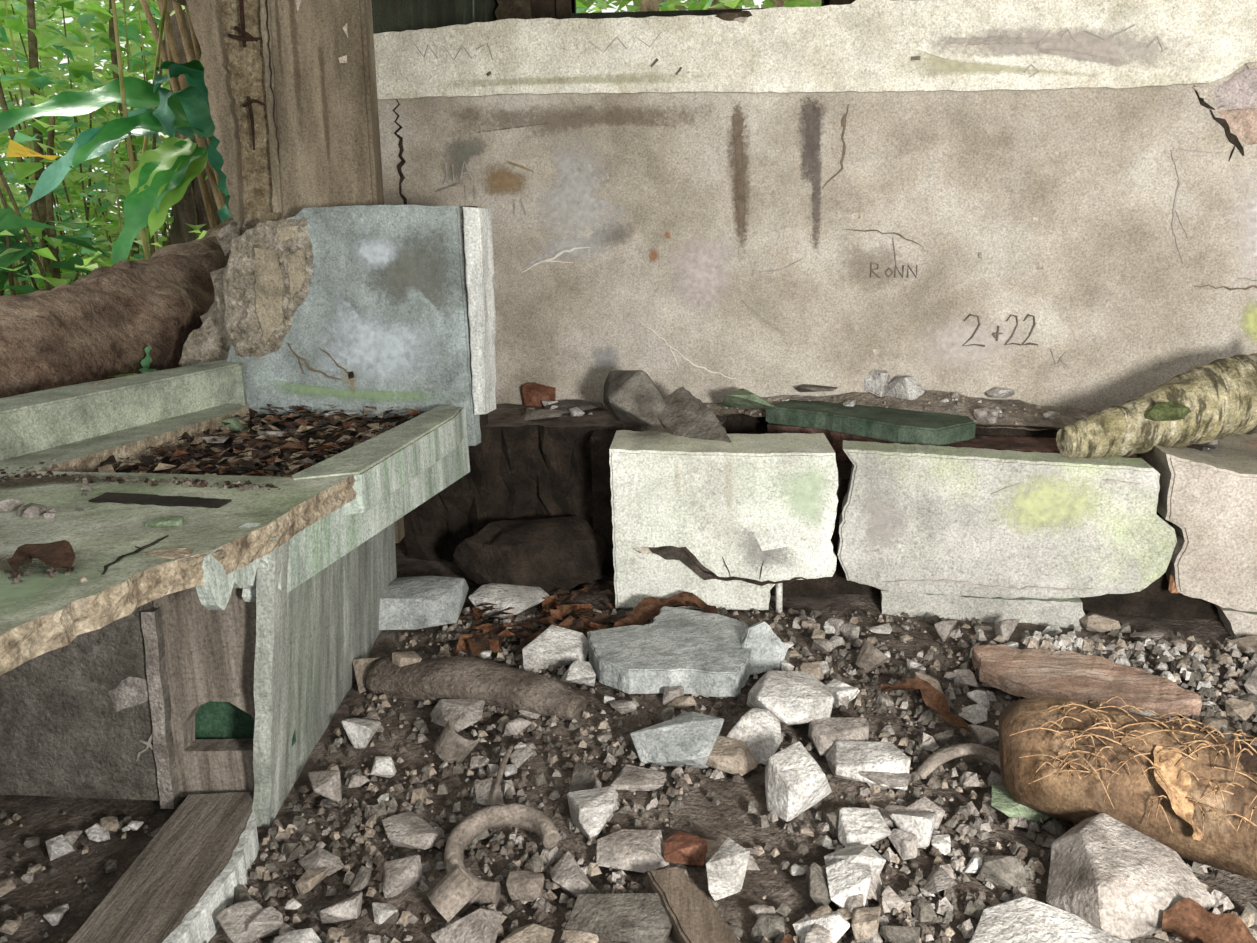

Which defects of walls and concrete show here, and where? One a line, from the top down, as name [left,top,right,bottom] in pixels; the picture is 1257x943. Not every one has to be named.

spalling [1193,63,1257,145]
spalling [221,0,314,359]
water stain [729,108,749,242]
water stain [799,98,825,246]
crack [633,547,809,586]